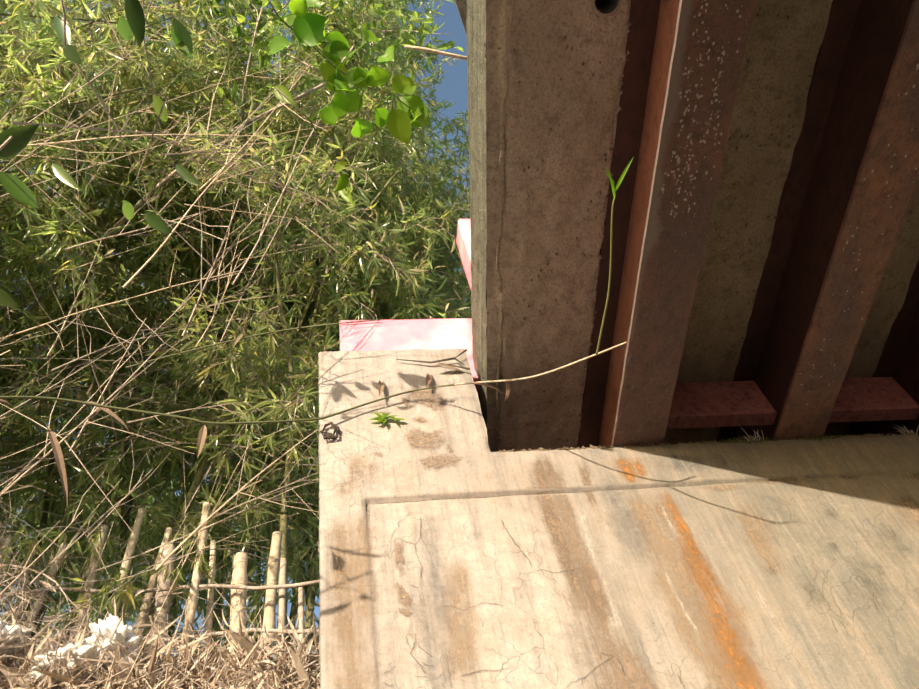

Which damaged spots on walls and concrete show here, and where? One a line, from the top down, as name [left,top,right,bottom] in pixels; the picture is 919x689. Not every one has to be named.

corrosion [535,459,656,689]
corrosion [666,498,762,689]